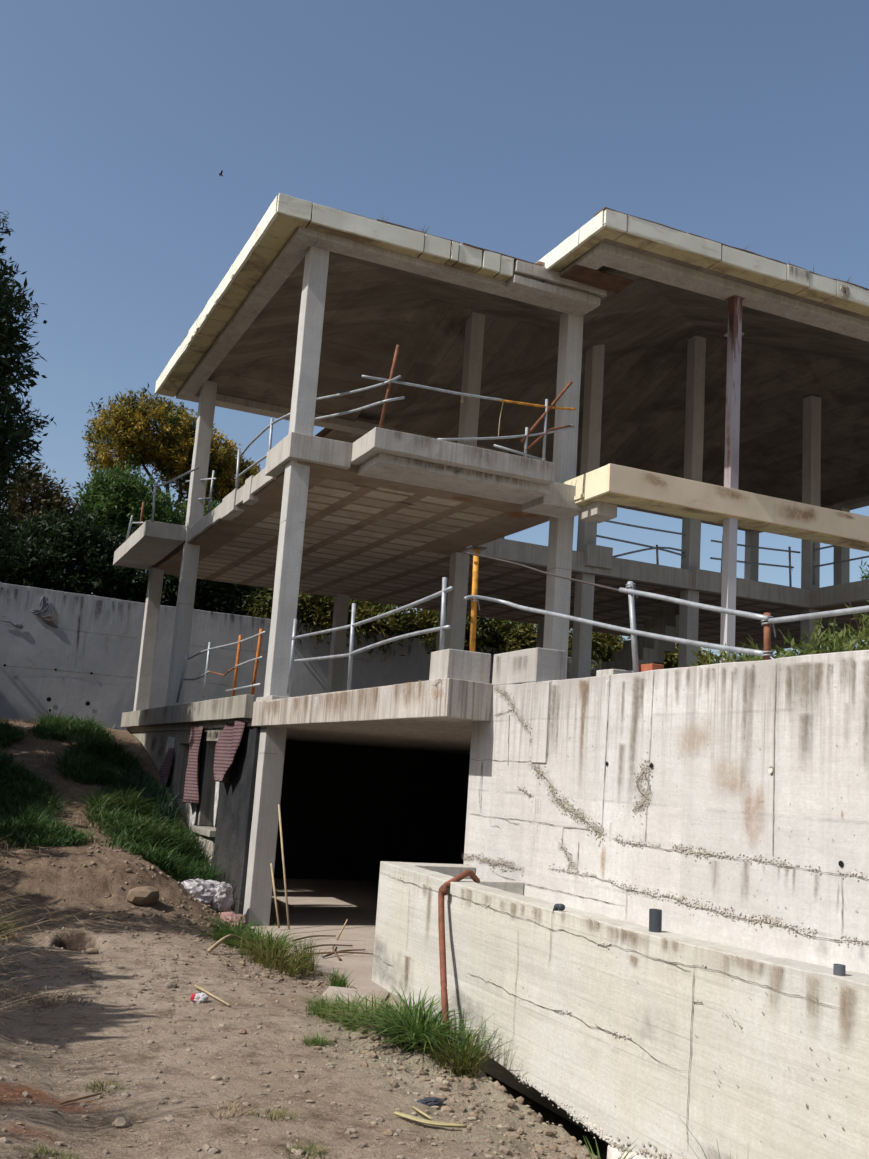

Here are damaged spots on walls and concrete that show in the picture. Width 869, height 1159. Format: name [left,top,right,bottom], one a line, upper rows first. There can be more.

leakage [787,662,832,695]
leakage [852,660,869,738]
crack [463,686,624,906]
crack [631,757,652,824]
crack [374,872,842,1143]
leakage [840,986,852,1031]